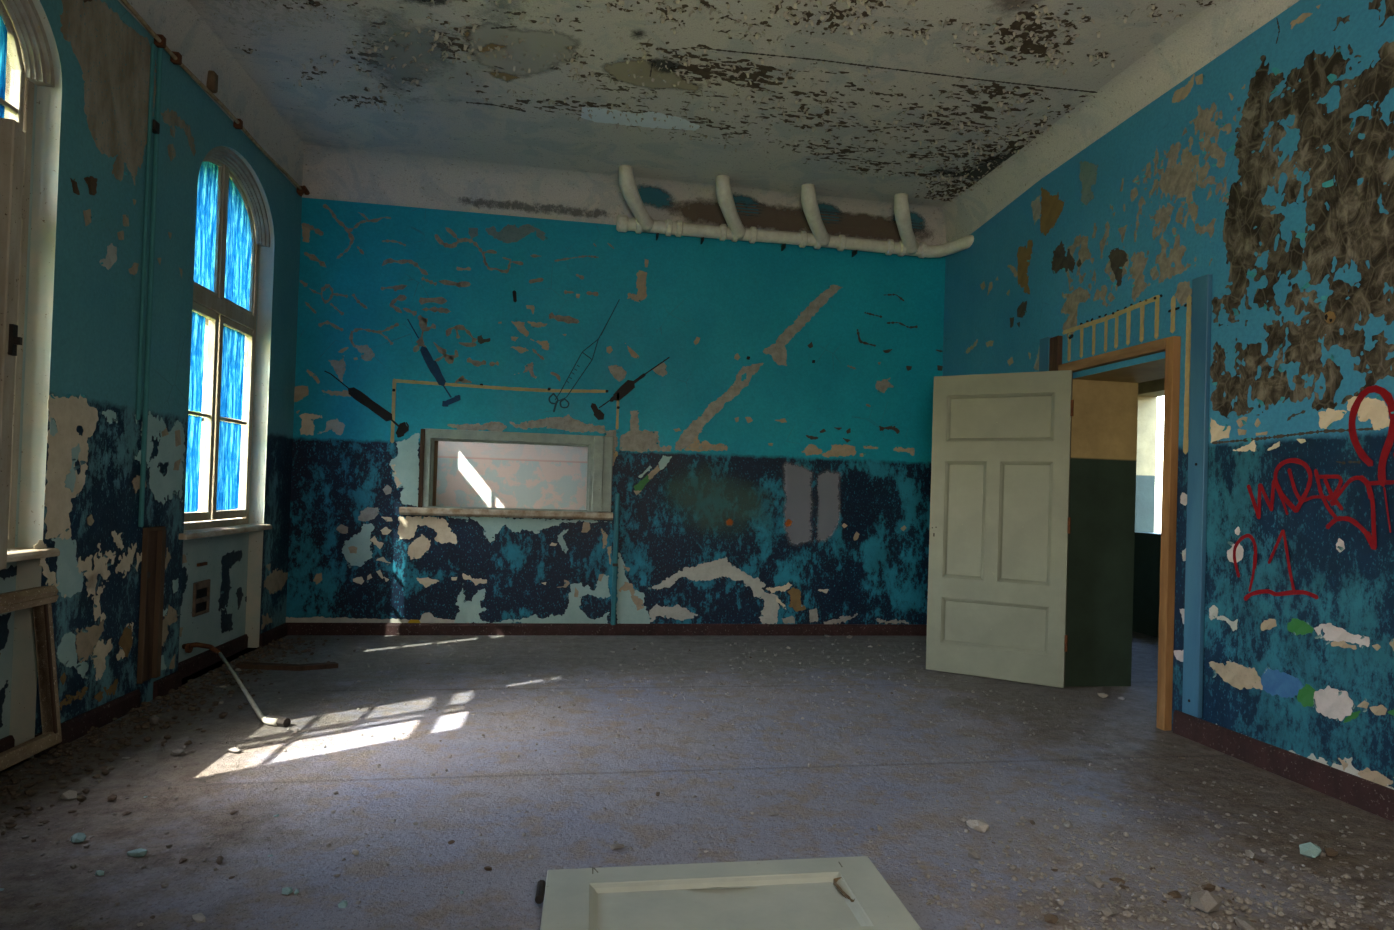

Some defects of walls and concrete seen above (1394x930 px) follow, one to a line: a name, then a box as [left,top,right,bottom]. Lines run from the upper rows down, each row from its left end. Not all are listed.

leakage [464,24,577,82]
leakage [603,59,698,92]
peeling [225,0,1116,202]
leakage [936,148,1020,182]
flaking render [980,0,1394,452]
peeling [763,285,843,366]
peeling [132,411,185,505]
flaking render [448,410,728,495]
peeling [33,393,142,710]
peeling [261,433,858,630]
peeling [1261,618,1394,651]
peeling [1289,750,1394,790]